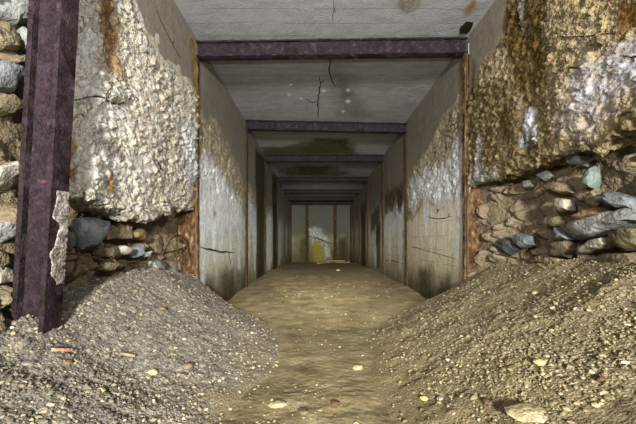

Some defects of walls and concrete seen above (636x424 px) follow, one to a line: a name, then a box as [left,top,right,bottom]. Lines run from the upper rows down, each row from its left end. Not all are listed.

crack [74,84,137,112]
corrosion [101,0,118,68]
spalling [69,0,199,224]
crack [307,60,335,117]
spalling [467,0,636,188]
crack [200,247,233,264]
damp [181,124,359,285]
damp [361,141,462,268]